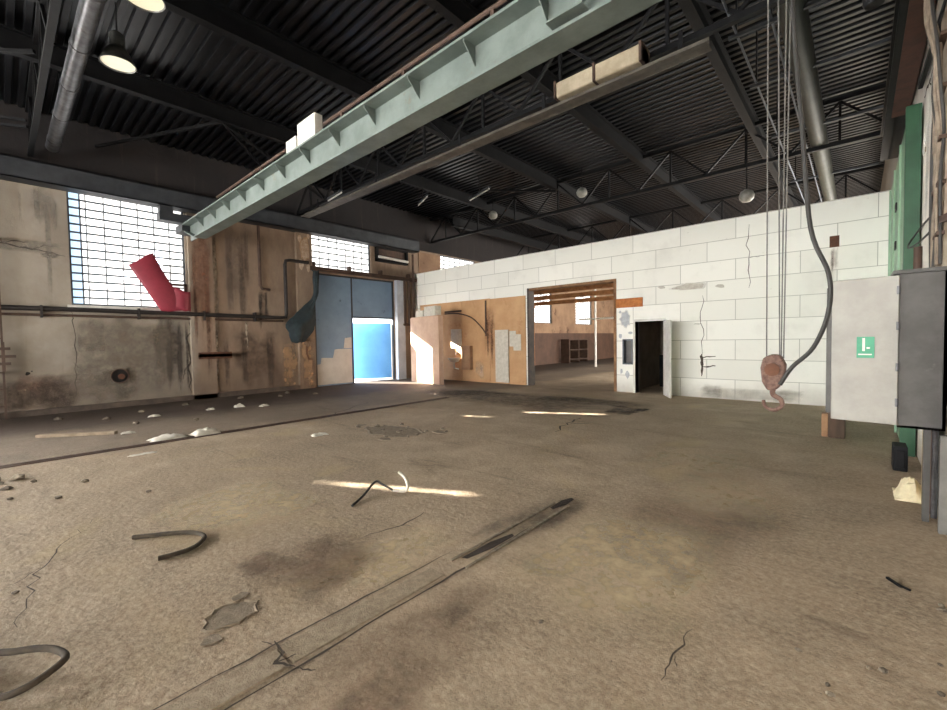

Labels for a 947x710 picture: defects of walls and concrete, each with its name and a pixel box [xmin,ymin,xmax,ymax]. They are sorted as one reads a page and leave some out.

damp [157,321,189,383]
crack [700,299,716,376]
crack [13,526,84,627]
crack [661,629,692,680]